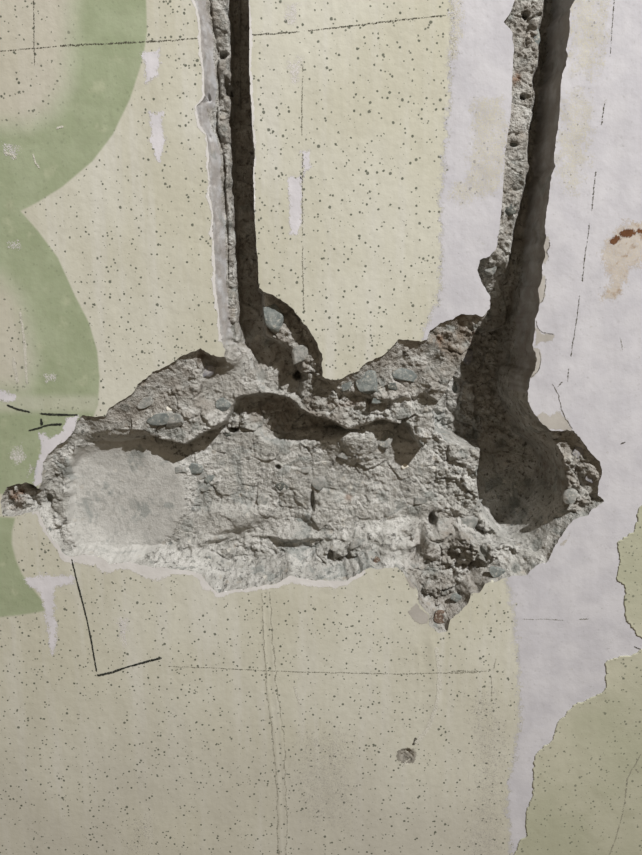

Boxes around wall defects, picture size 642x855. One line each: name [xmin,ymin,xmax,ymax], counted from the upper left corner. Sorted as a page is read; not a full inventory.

peeling [24,572,75,656]
spalling [0,0,604,633]
peeling [503,0,642,855]
corrosion [596,218,642,302]